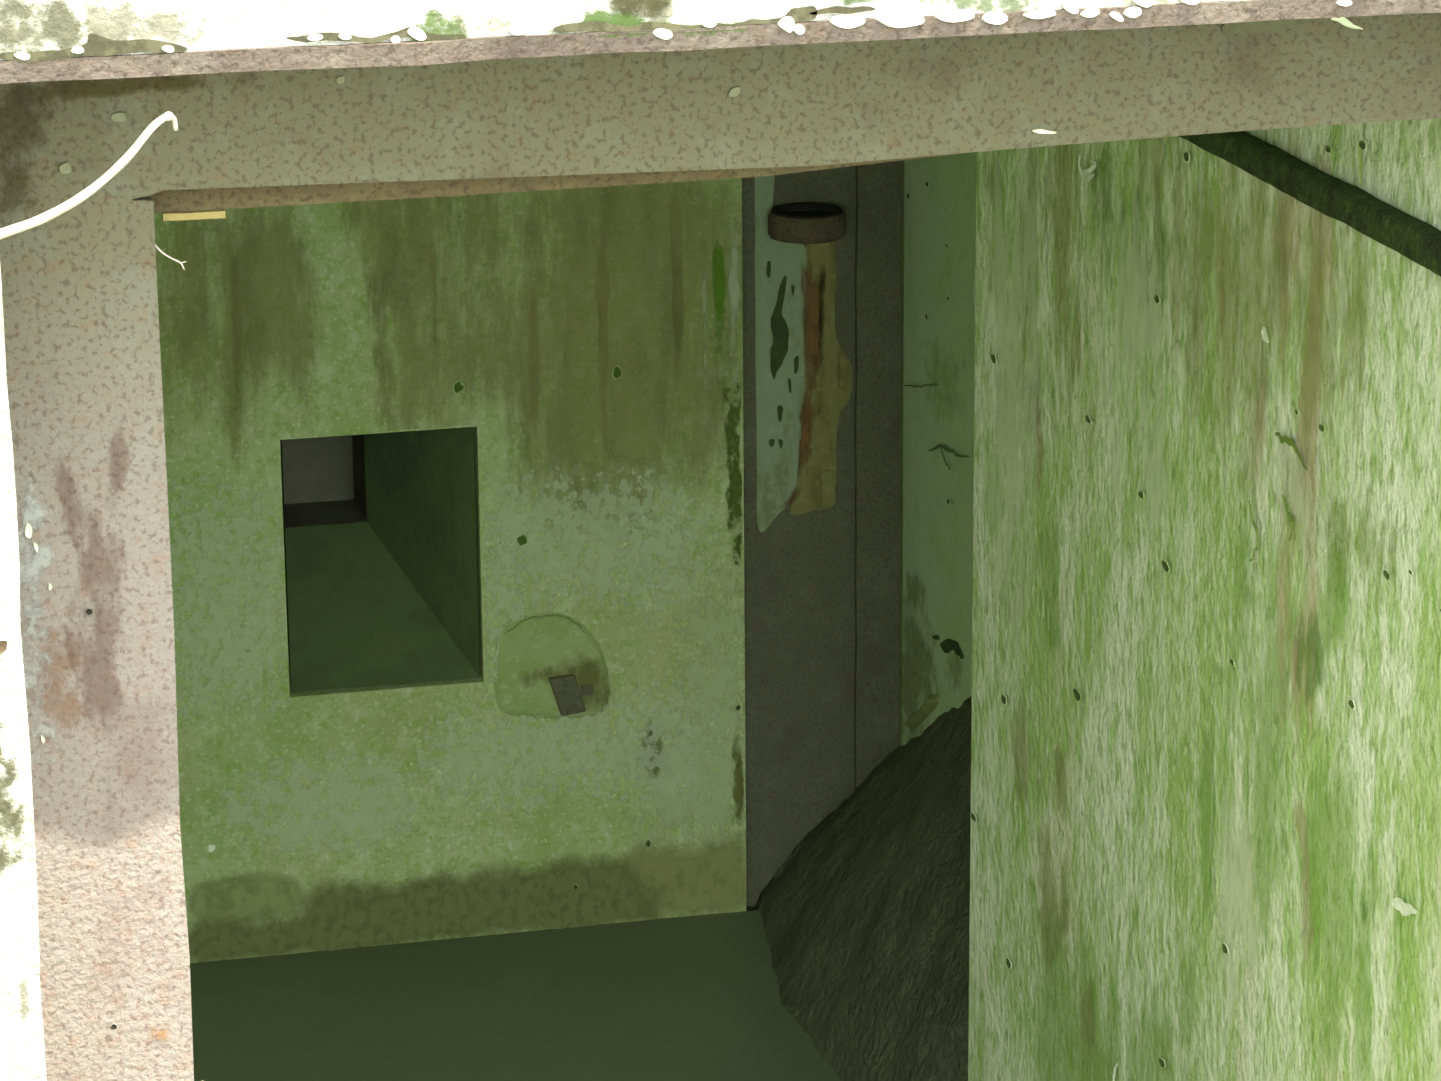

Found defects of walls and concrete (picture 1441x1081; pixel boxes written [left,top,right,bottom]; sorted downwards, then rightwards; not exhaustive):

leakage [176,220,206,363]
peeling [755,175,853,533]
rust [800,270,825,471]
leakage [167,476,289,719]
leakage [188,182,746,963]